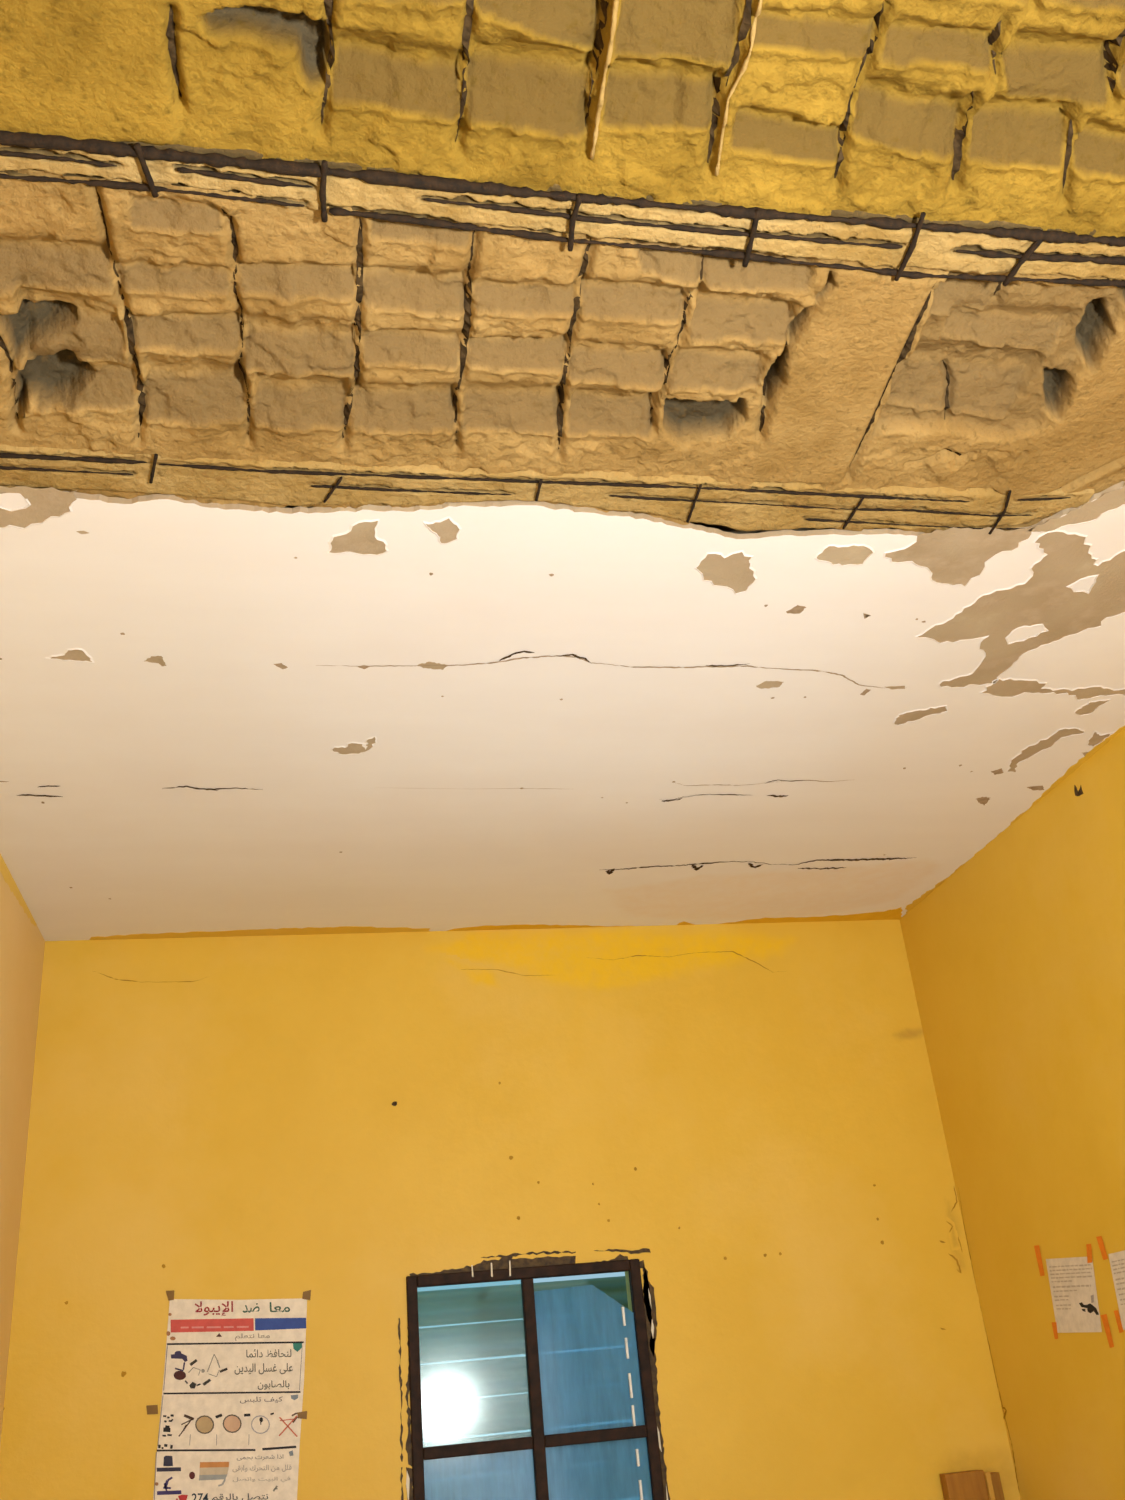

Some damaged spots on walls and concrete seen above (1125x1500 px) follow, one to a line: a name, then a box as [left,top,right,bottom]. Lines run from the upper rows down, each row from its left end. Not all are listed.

spalling [0,0,1125,775]
crack [316,651,881,688]
crack [603,857,916,875]
crack [587,951,784,972]